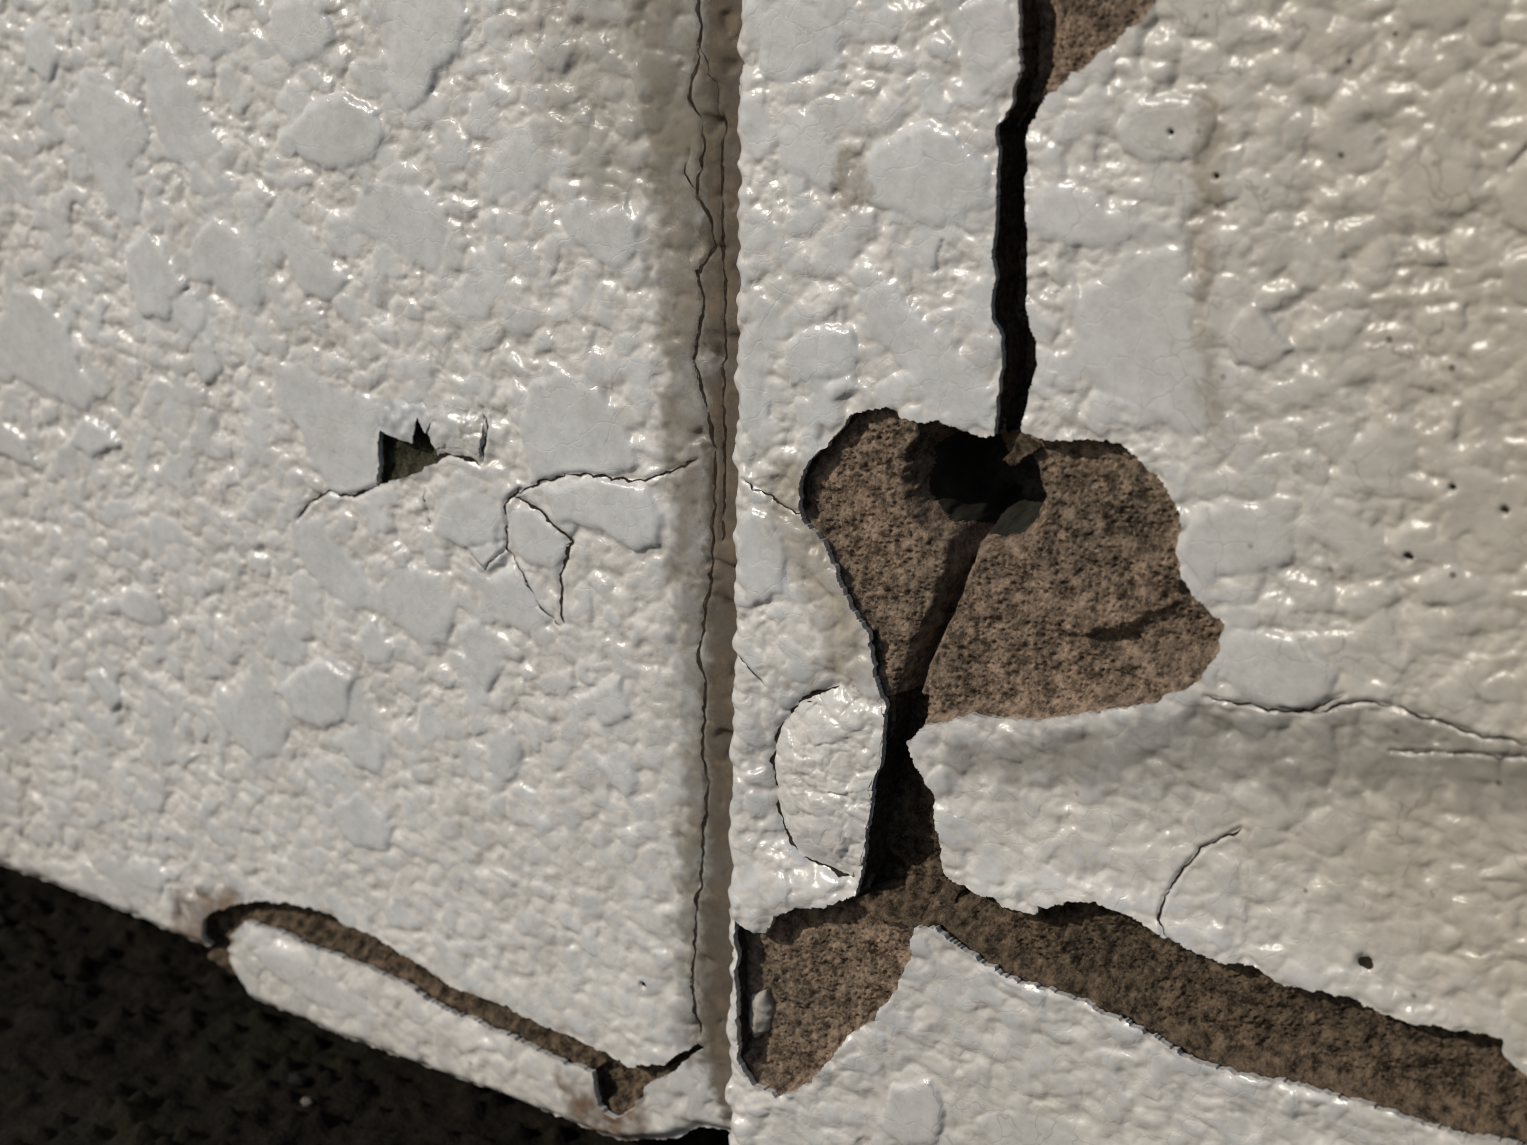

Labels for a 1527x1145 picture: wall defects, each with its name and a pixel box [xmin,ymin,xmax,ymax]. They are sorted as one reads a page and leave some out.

spalling [999,0,1156,139]
peeling [377,397,484,484]
crack [205,0,802,1116]
spalling [802,407,1225,751]
crack [995,100,1043,466]
spalling [737,871,914,1096]
crack [769,684,1527,1145]